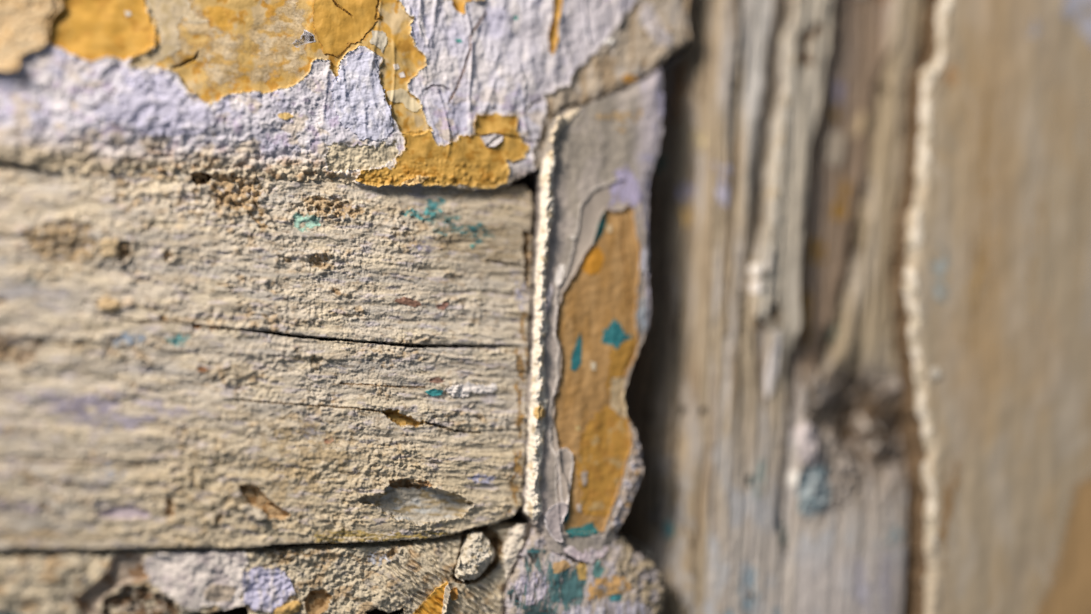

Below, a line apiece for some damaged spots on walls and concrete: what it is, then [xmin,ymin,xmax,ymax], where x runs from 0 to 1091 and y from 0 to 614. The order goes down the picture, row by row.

peeling [0,0,691,189]
crack [475,40,691,147]
crack [0,160,41,173]
crack [827,39,900,348]
crack [96,313,520,348]
peeling [515,179,648,614]
peeling [72,547,333,614]
crack [0,524,493,552]
flaking render [627,541,652,558]